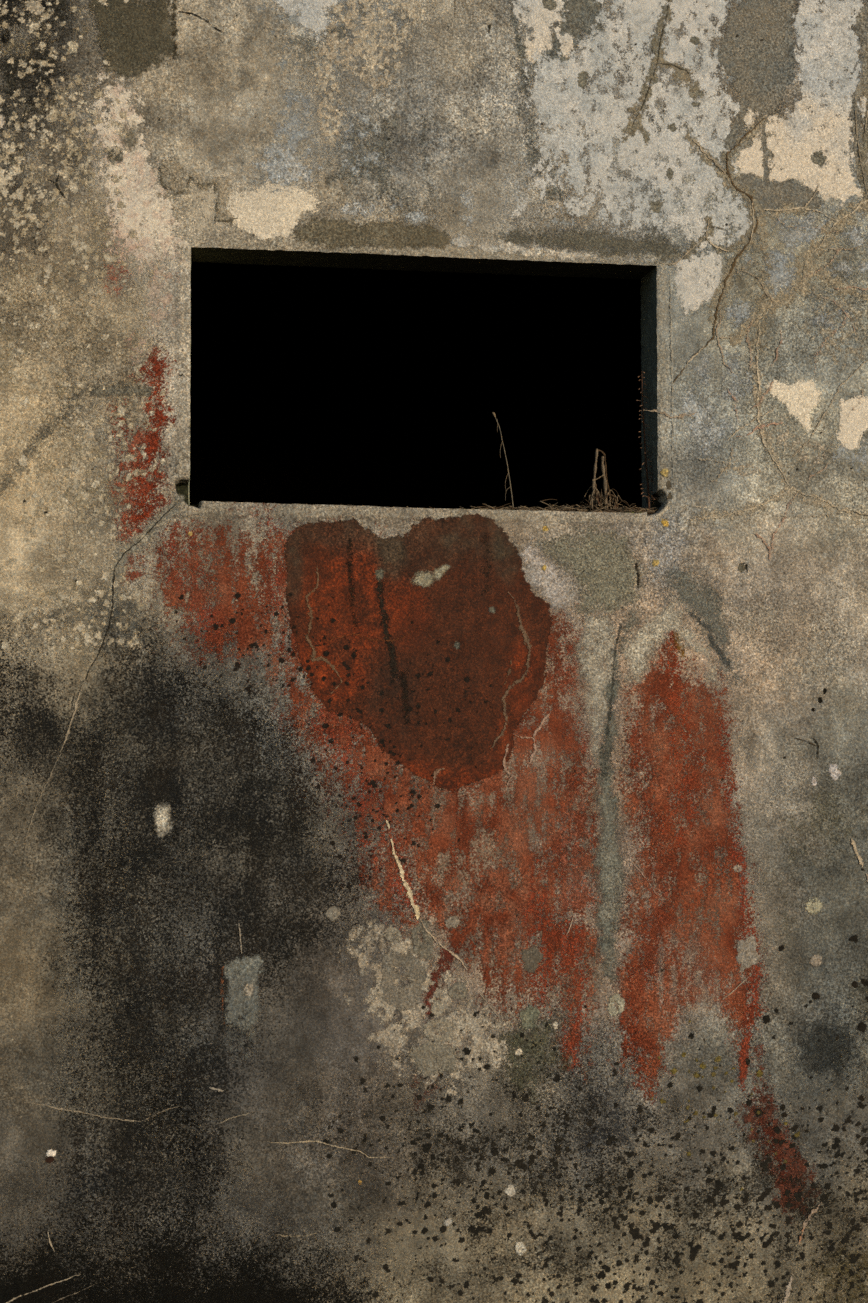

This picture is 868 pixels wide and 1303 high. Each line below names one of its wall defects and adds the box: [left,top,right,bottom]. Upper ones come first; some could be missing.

peeling [502,0,868,321]
crack [622,0,868,597]
peeling [765,379,868,473]
damp [0,511,868,1303]
rust [104,346,822,1224]